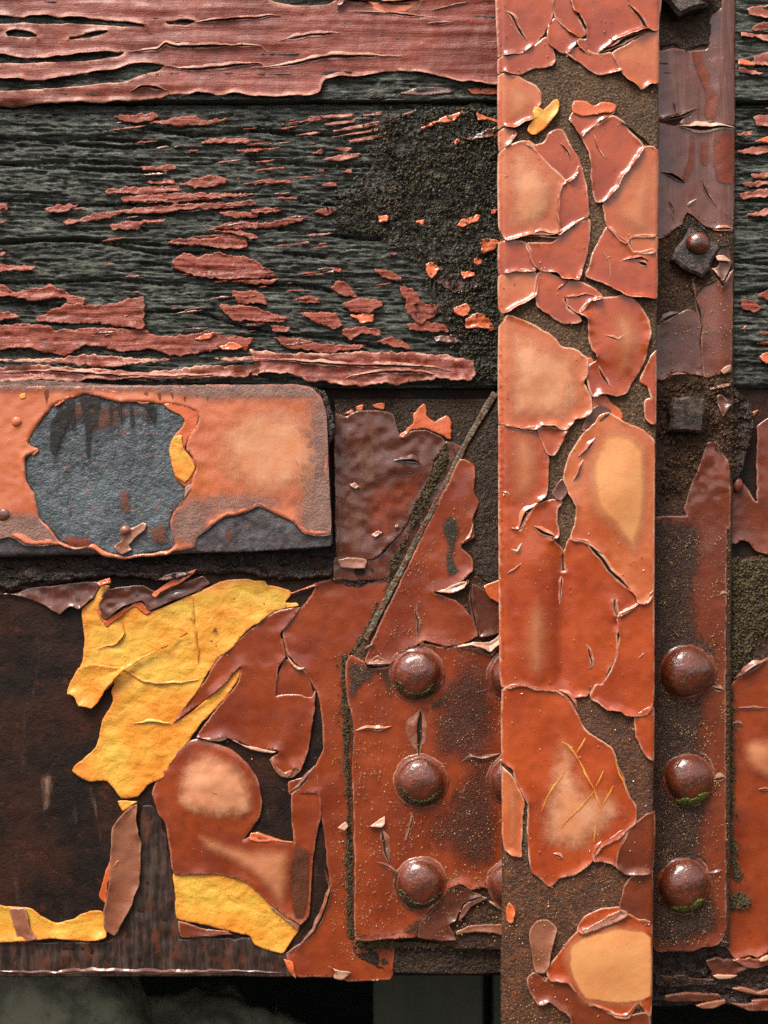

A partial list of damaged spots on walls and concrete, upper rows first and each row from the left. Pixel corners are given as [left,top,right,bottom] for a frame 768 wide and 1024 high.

crack [505,11,527,40]
crack [598,3,650,52]
peeling [738,5,768,75]
corrosion [693,51,721,119]
corrosion [683,132,734,183]
peeling [737,108,768,155]
crack [517,217,584,239]
crack [557,251,649,299]
spalling [0,110,476,556]
corrosion [370,477,424,540]
peeling [338,0,732,1024]
peeling [0,576,322,978]